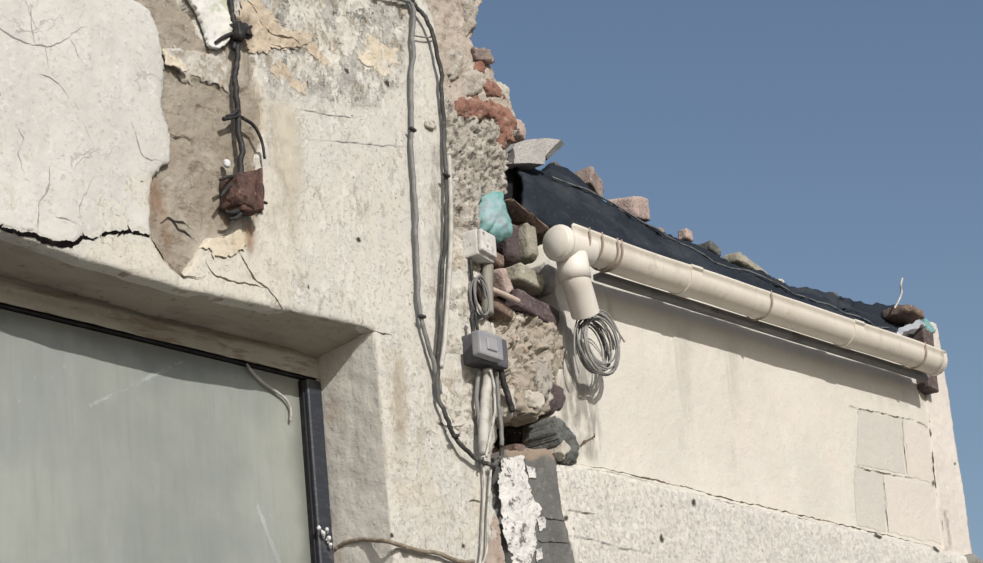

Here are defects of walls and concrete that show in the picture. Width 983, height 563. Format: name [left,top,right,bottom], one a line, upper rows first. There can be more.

spalling [134,0,330,273]
peeling [356,33,399,76]
spalling [426,0,526,150]
crack [0,168,283,310]
flaking render [441,235,546,563]